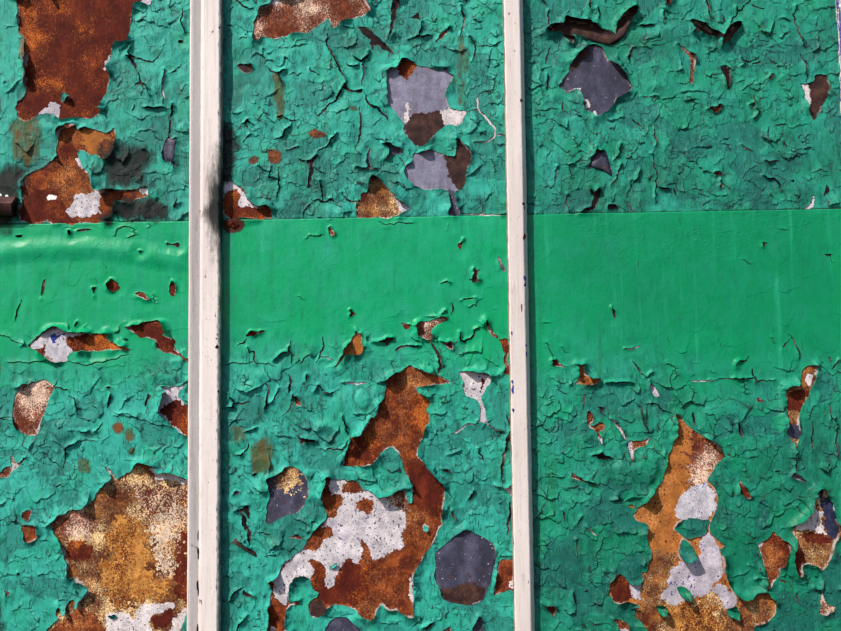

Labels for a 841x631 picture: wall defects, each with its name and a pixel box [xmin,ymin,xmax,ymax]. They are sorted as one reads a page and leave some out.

corrosion [11,0,157,229]
crack [253,0,435,222]
peeling [355,23,475,220]
crack [607,115,681,207]
crack [42,383,169,472]
peeling [24,316,188,366]
corrosion [42,423,188,631]
peeling [141,378,188,440]
corrosion [265,361,455,631]
peeling [430,526,500,631]
crack [536,341,778,433]
corrosion [605,410,841,631]